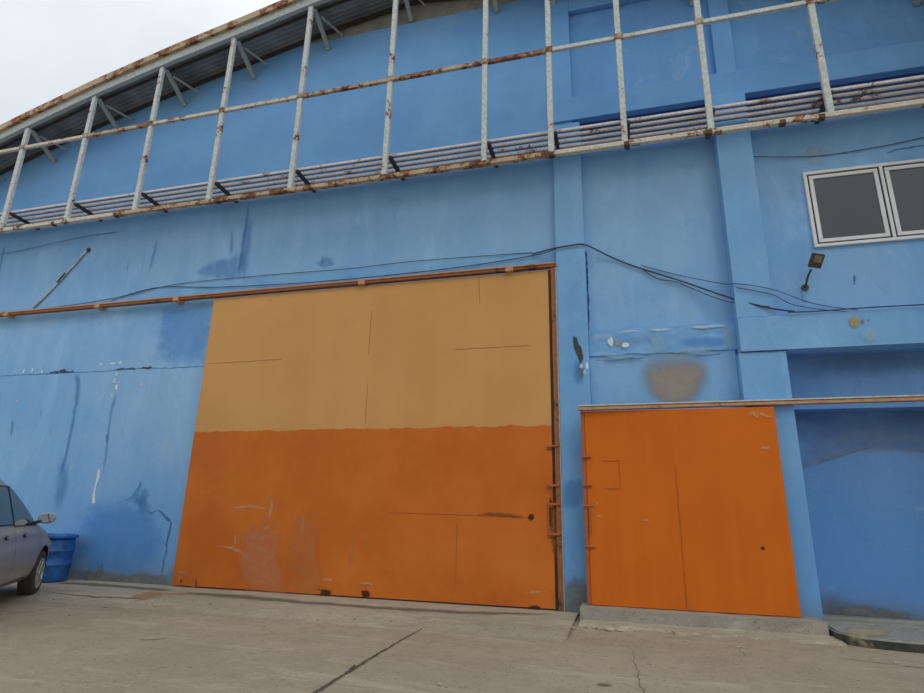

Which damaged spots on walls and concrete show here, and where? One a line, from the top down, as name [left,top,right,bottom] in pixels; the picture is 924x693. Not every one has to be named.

flaking render [573,337,589,377]
water stain [83,566,164,585]